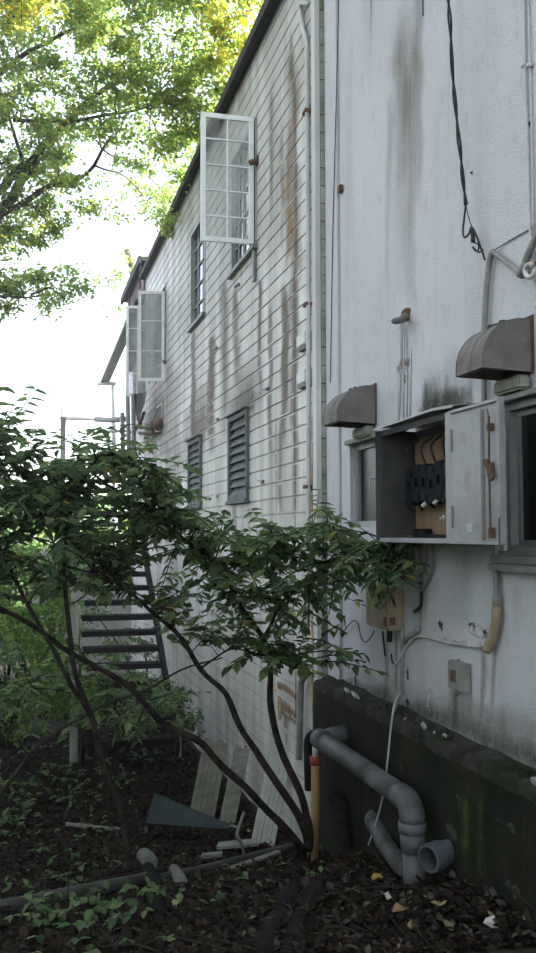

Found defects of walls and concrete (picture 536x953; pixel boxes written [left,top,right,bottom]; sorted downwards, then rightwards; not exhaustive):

corrosion [286,151,298,258]
water stain [191,288,239,441]
water stain [268,294,289,427]
water stain [425,391,463,410]